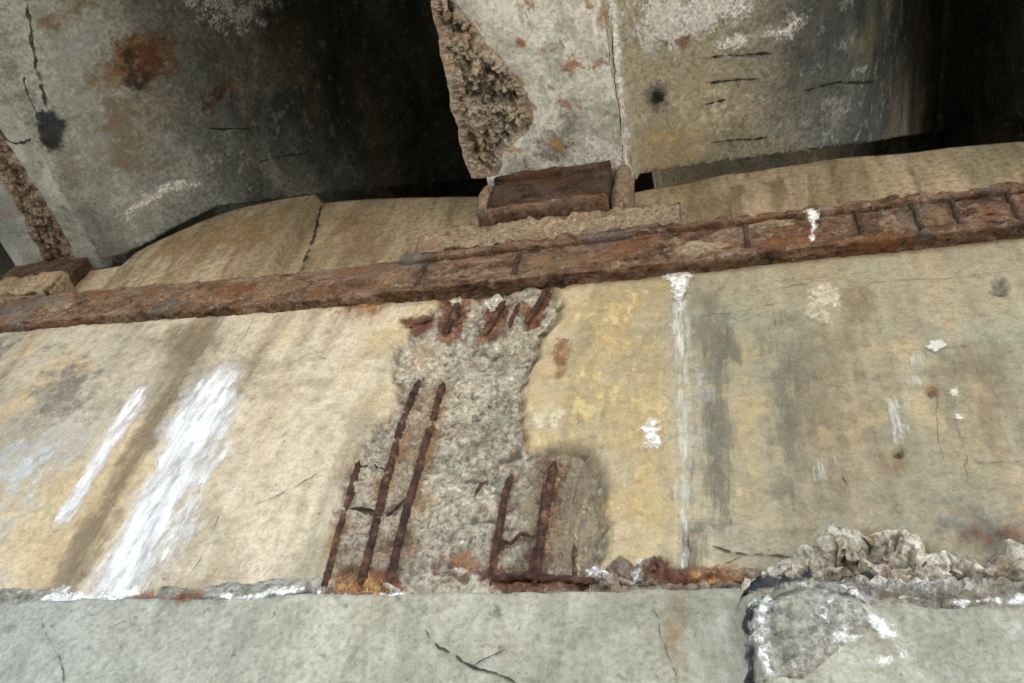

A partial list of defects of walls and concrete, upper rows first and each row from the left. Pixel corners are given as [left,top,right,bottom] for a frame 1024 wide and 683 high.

crack [4,4,47,145]
rust [88,34,177,90]
spalling [431,0,534,179]
crack [609,0,624,163]
crack [701,52,772,105]
spalling [0,129,75,261]
rust [399,287,553,344]
leakage [32,316,237,601]
spalling [324,286,1024,609]
leakage [663,272,746,569]
rust [630,557,745,585]
crack [426,631,516,683]